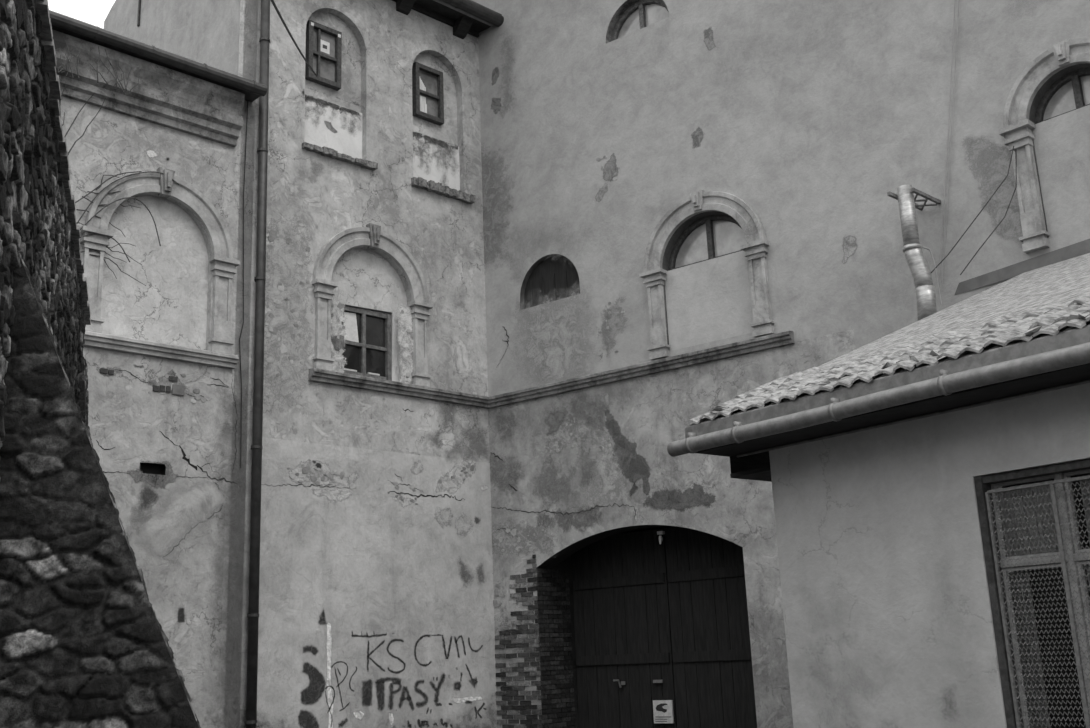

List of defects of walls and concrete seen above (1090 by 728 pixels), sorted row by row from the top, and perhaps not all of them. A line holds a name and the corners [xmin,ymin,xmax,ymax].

spalling [595,153,618,202]
flaking render [600,299,626,356]
spalling [96,365,229,403]
crack [160,380,238,557]
spalling [261,459,359,502]
flaking render [492,521,555,555]